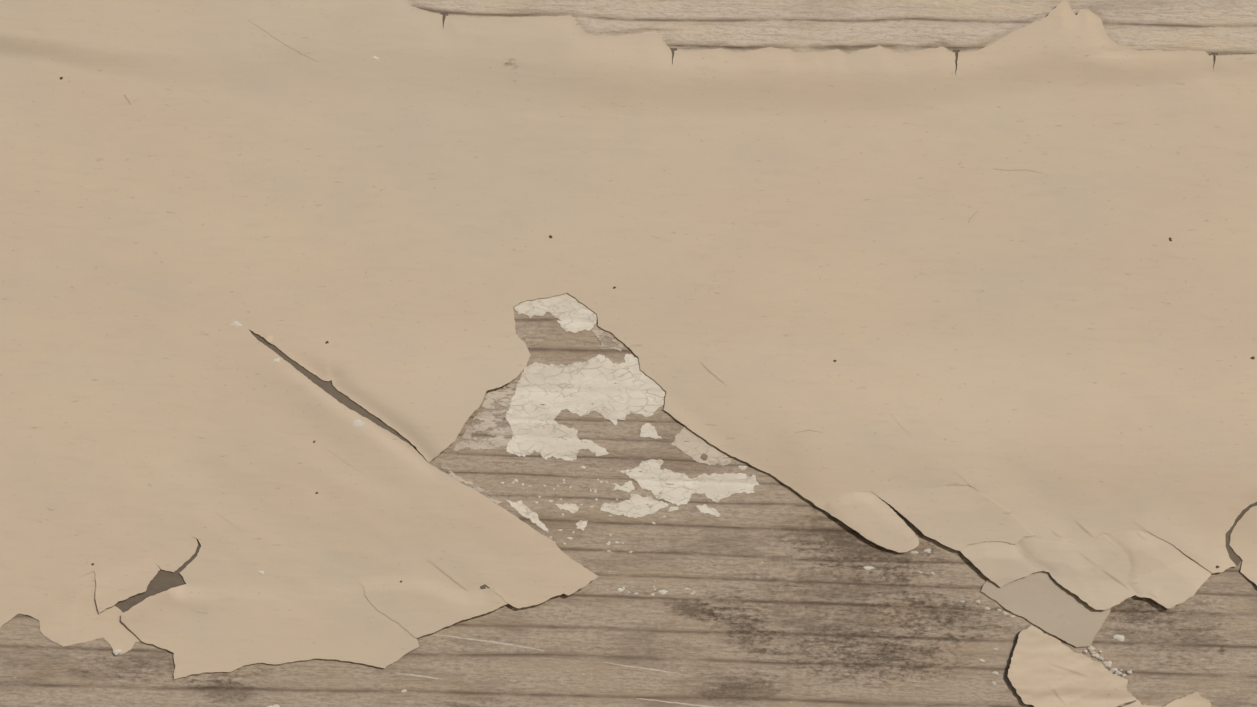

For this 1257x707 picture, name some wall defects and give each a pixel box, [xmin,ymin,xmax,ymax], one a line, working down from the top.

peeling [407,0,1257,56]
crack [250,330,414,447]
peeling [0,293,1257,707]
crack [1225,502,1257,568]